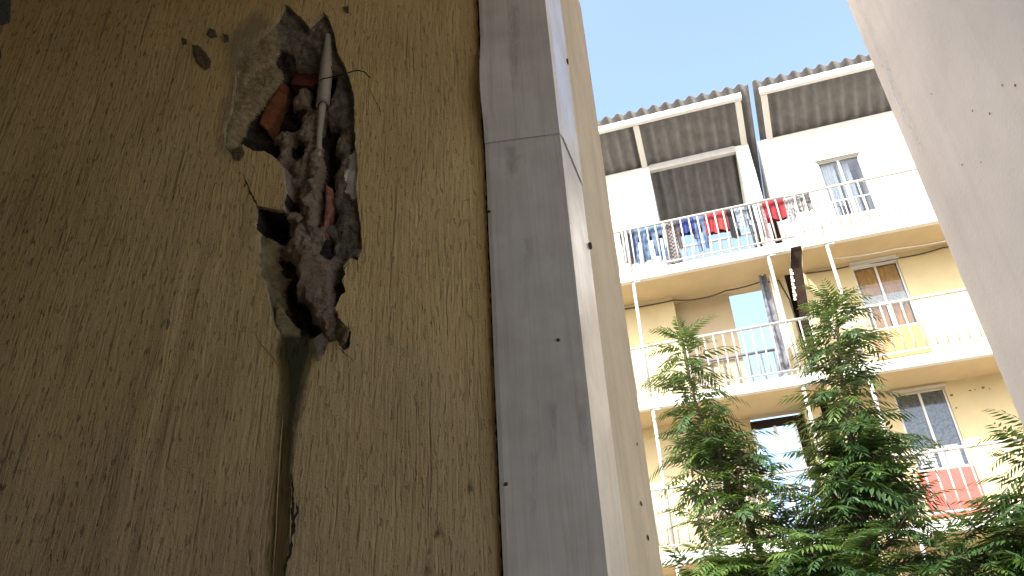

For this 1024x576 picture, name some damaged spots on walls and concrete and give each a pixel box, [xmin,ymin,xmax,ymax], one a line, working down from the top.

spalling [224,4,362,361]
crack [283,473,299,576]
damp [271,336,315,576]